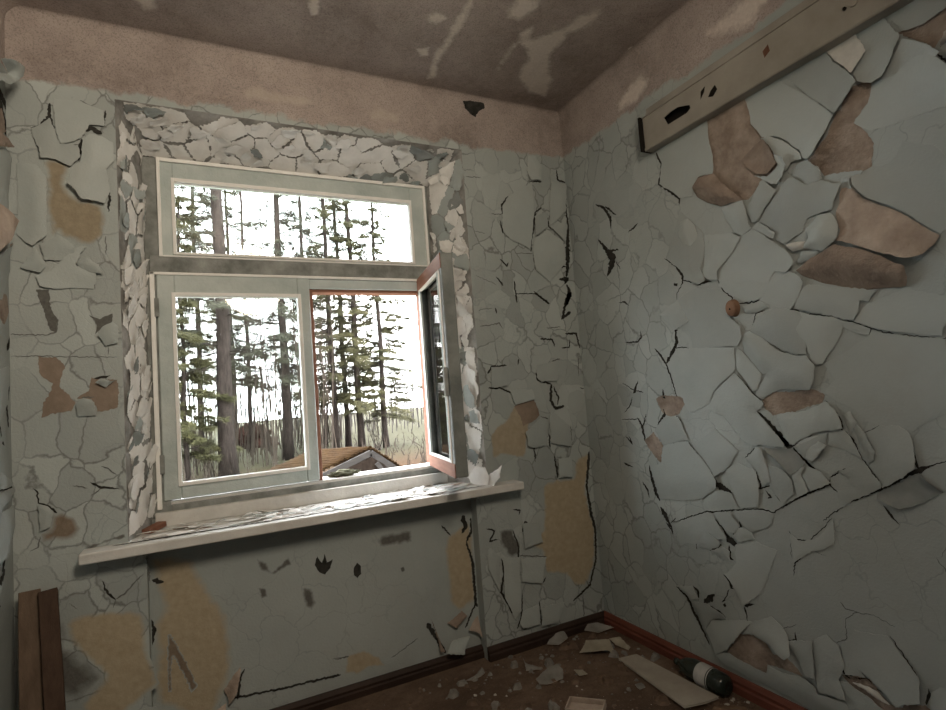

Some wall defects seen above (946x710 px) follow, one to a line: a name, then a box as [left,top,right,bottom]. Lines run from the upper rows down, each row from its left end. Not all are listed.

peeling [0,58,25,84]
peeling [0,98,502,539]
crack [596,204,638,276]
crack [665,259,765,325]
peeling [645,0,946,606]
crack [476,170,597,616]
peeling [0,471,16,563]
crack [102,494,429,607]
crack [442,509,547,629]
crack [622,328,946,645]
crack [234,656,349,699]
peeling [677,585,946,710]